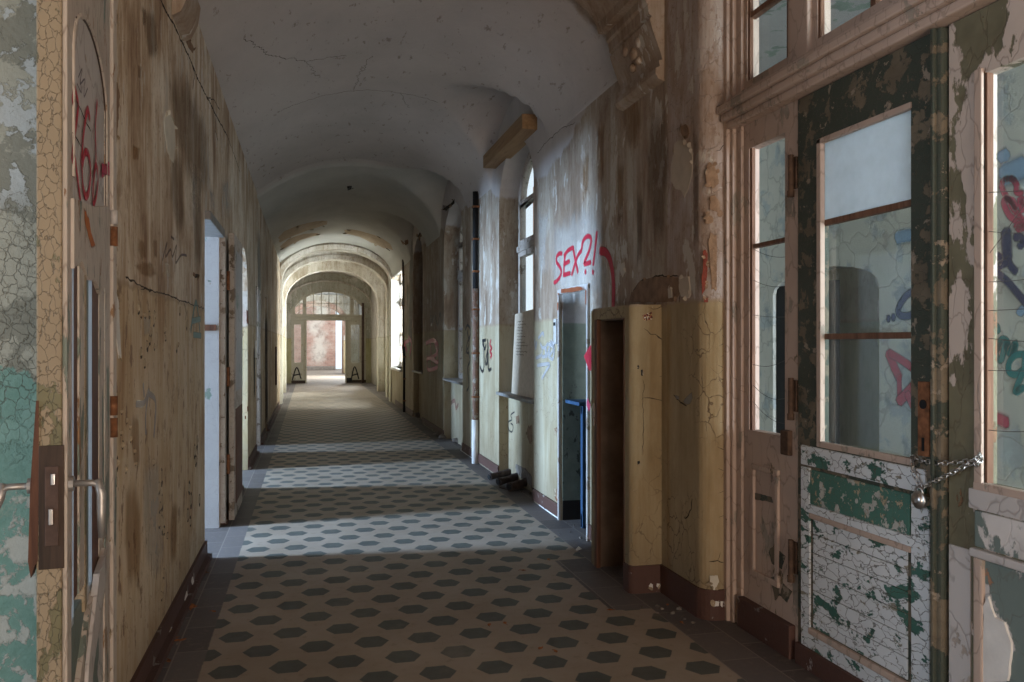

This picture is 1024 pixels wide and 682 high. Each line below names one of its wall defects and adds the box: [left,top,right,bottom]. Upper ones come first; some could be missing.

crack [160,0,239,168]
crack [126,276,204,319]
spalling [629,124,723,304]